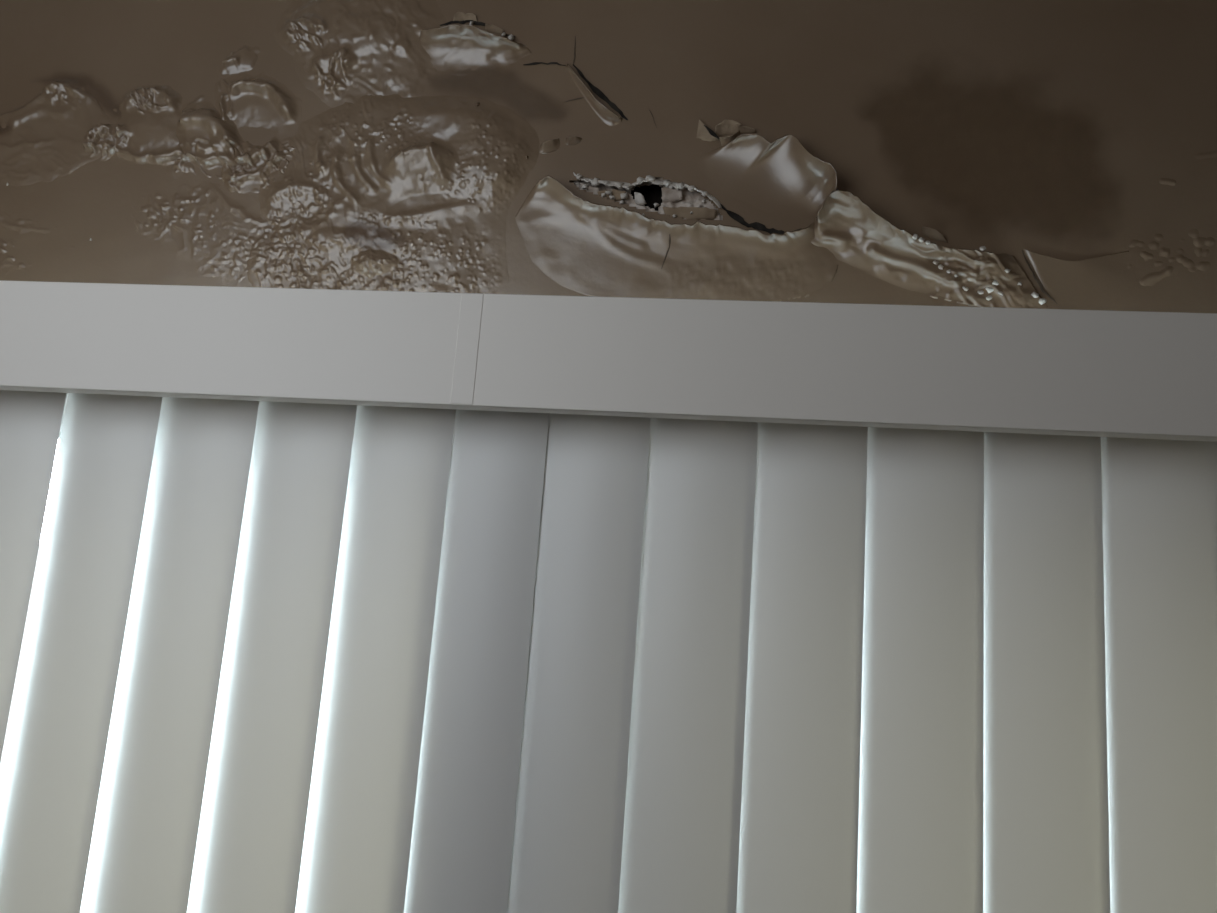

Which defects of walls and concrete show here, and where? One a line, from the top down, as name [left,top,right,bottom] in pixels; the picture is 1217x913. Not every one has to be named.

crack [523,36,656,126]
peeling [569,134,838,234]